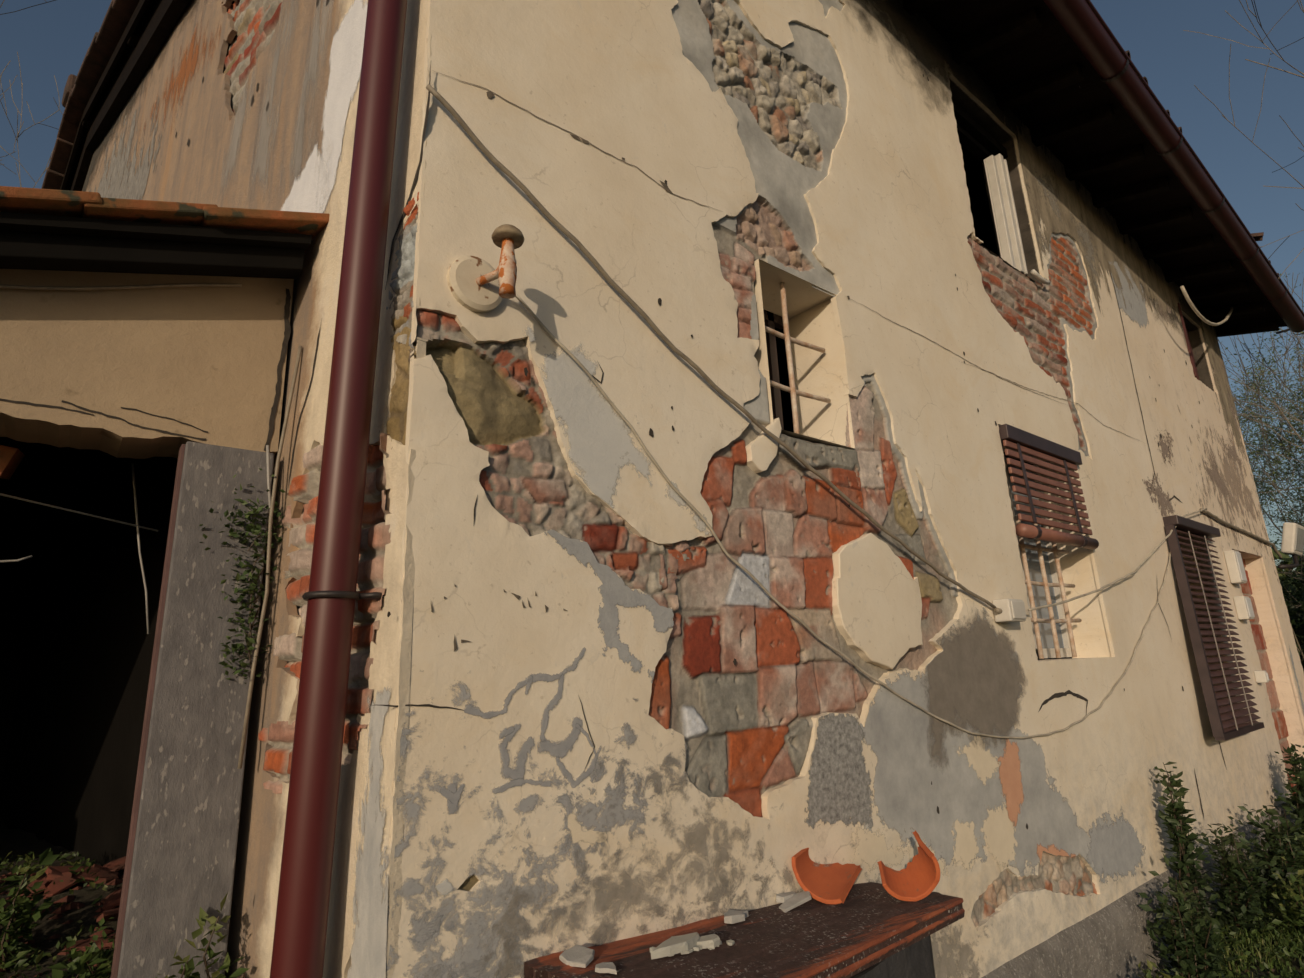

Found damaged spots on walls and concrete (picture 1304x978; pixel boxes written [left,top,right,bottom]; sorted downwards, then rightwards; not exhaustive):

spalling [224,0,283,115]
crack [0,398,208,441]
crack [385,64,717,290]
spalling [672,0,847,340]
crack [847,284,1181,505]
damp [853,0,1277,574]
spalling [273,445,323,679]
spalling [341,192,1146,978]
damp [386,757,803,978]
damp [590,744,687,794]
damp [931,926,980,978]
crack [1039,690,1088,714]